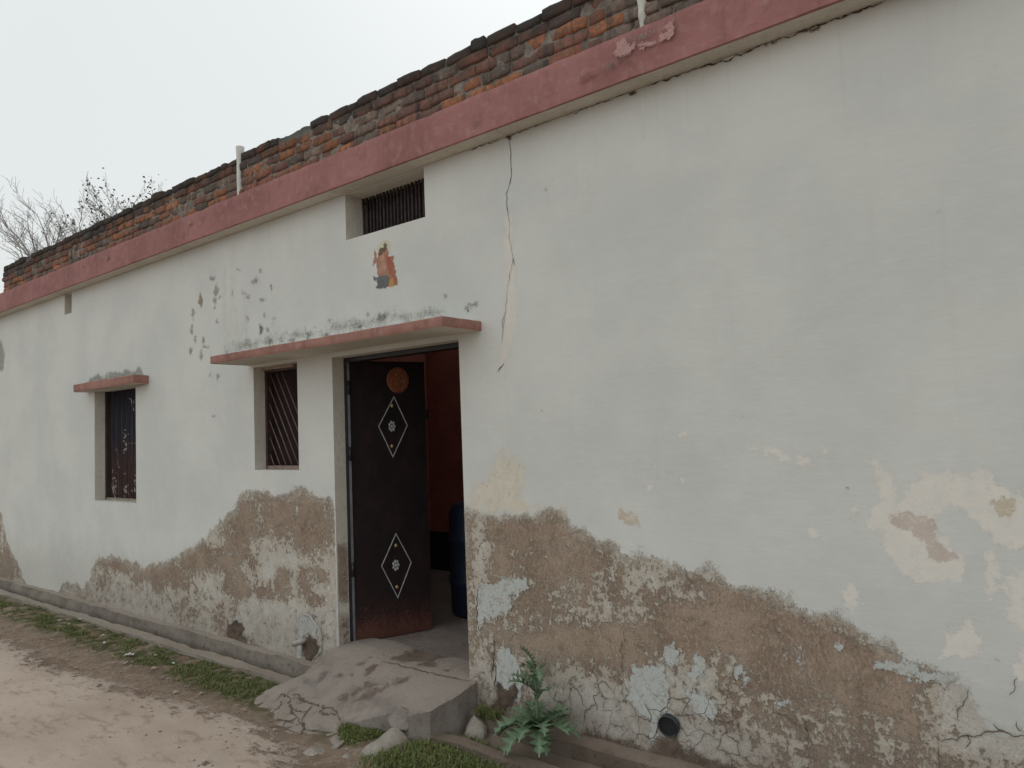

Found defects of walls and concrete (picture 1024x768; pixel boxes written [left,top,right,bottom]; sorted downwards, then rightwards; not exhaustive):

peeling [613,20,675,59]
crack [472,2,883,375]
peeling [59,486,350,662]
crack [268,693,342,735]
crack [553,631,751,768]
peeling [464,505,1024,768]
peeling [865,459,1024,682]
crack [938,689,1024,768]